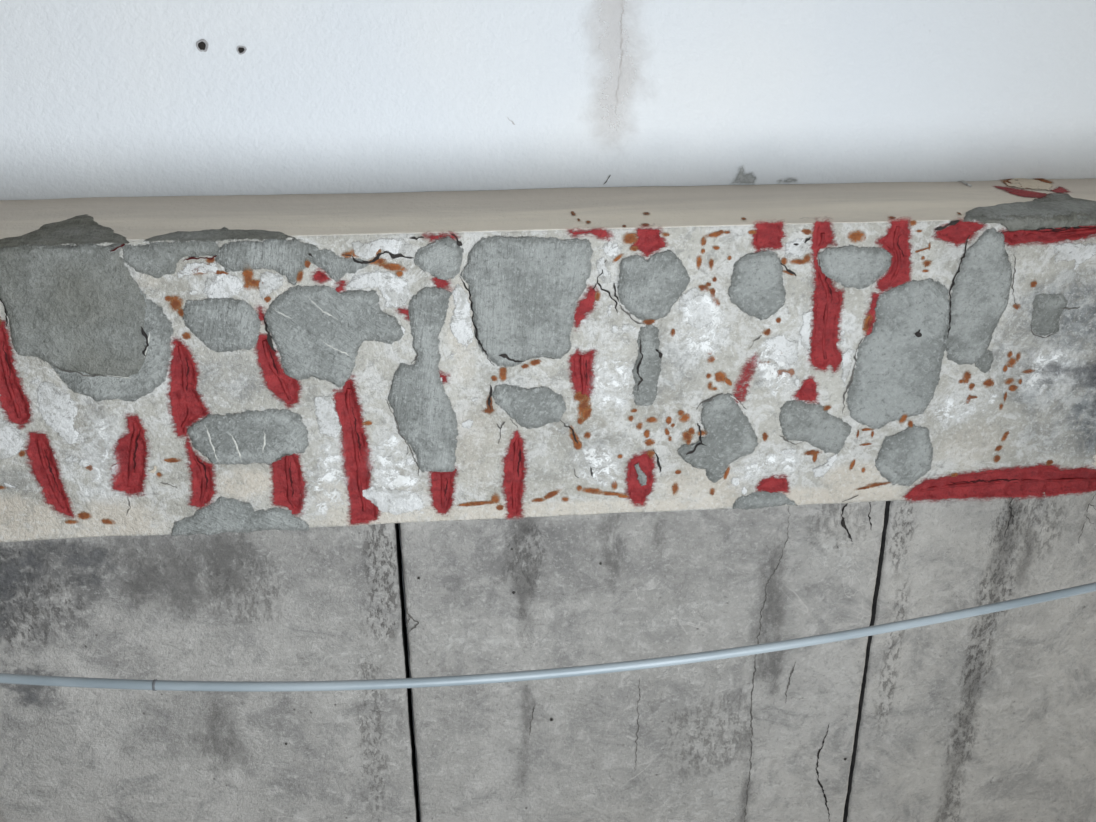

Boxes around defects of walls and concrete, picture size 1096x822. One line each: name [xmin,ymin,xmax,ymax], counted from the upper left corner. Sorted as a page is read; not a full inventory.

peeling [347,237,412,308]
crack [342,237,424,264]
peeling [449,284,474,359]
rust [707,352,732,390]
rust [959,351,1035,409]
damp [1026,349,1077,394]
peeling [0,419,25,459]
peeling [314,393,342,438]
rust [629,409,705,458]
damp [2,671,41,703]
crack [744,508,790,822]
crack [816,725,830,821]